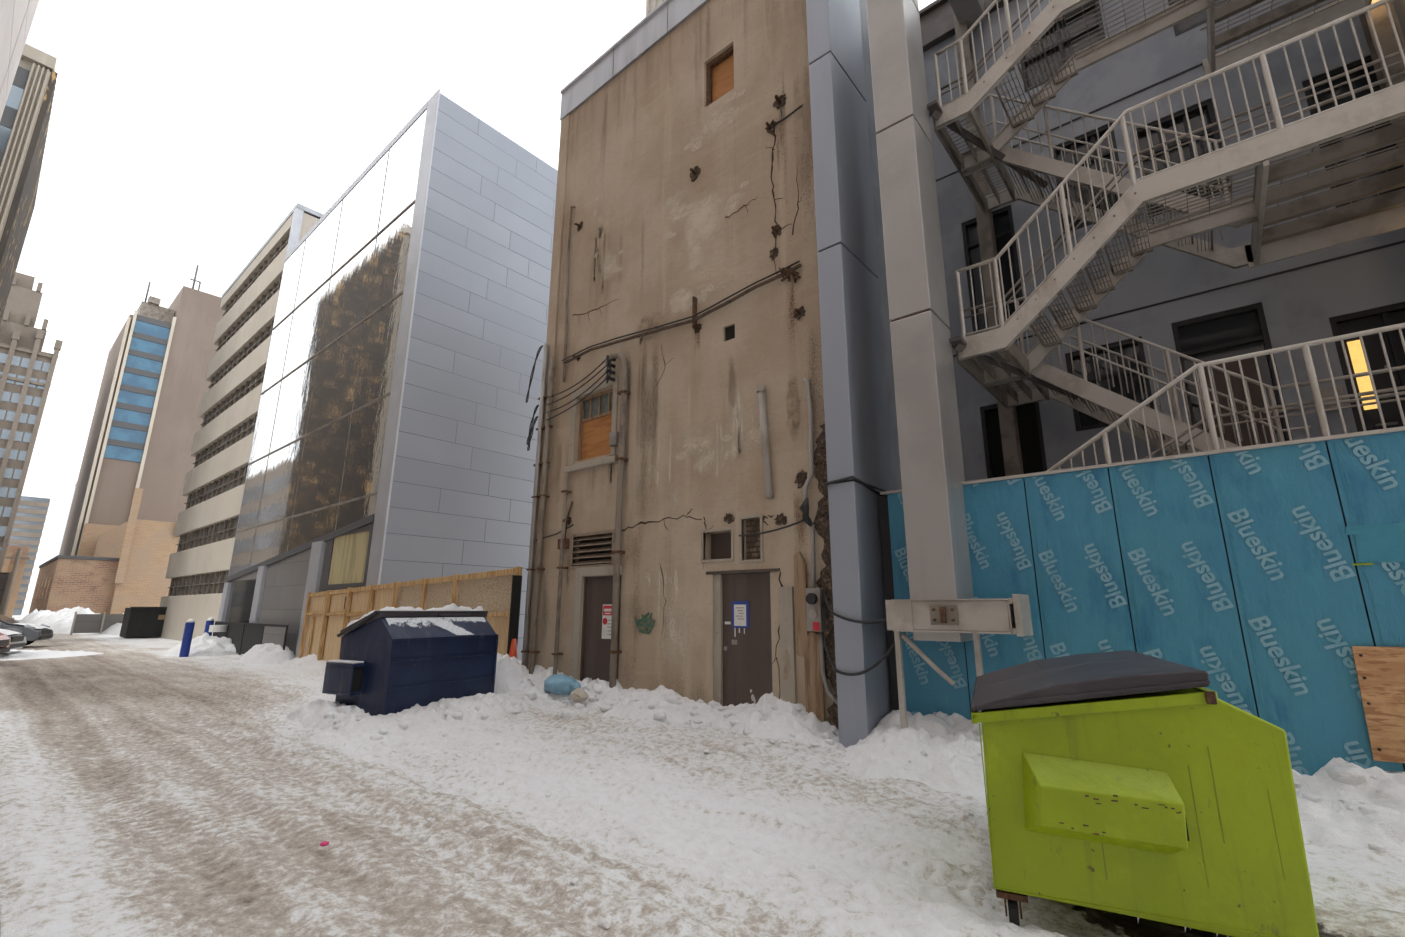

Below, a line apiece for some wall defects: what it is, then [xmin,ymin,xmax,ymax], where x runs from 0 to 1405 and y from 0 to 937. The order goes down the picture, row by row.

crack [725,121,802,275]
damp [547,338,754,703]
crack [659,565,667,635]
crack [622,510,713,568]